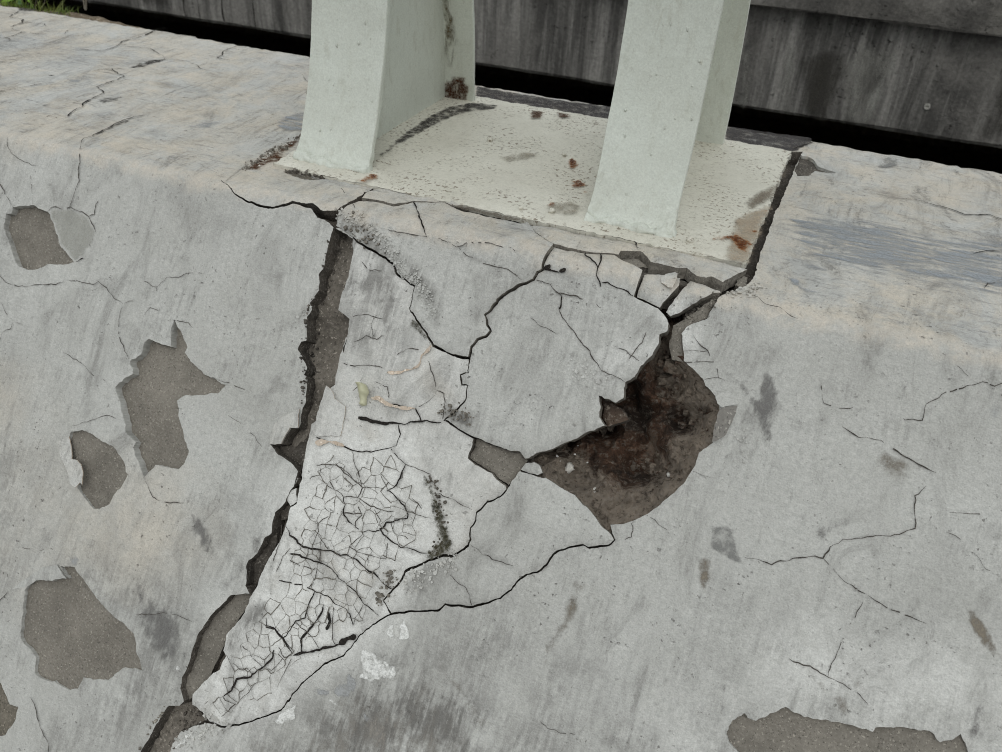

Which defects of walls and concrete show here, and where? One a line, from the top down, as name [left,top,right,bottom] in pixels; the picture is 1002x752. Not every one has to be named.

peeling [4,205,73,270]
crack [0,115,143,232]
crack [389,201,646,381]
rust [713,186,776,261]
peeling [115,320,225,477]
crack [903,366,1002,421]
peeling [69,430,128,509]
crack [150,188,513,752]
spalling [138,180,1002,752]
crack [748,385,936,704]
peeling [20,566,143,690]
peeling [0,683,18,736]